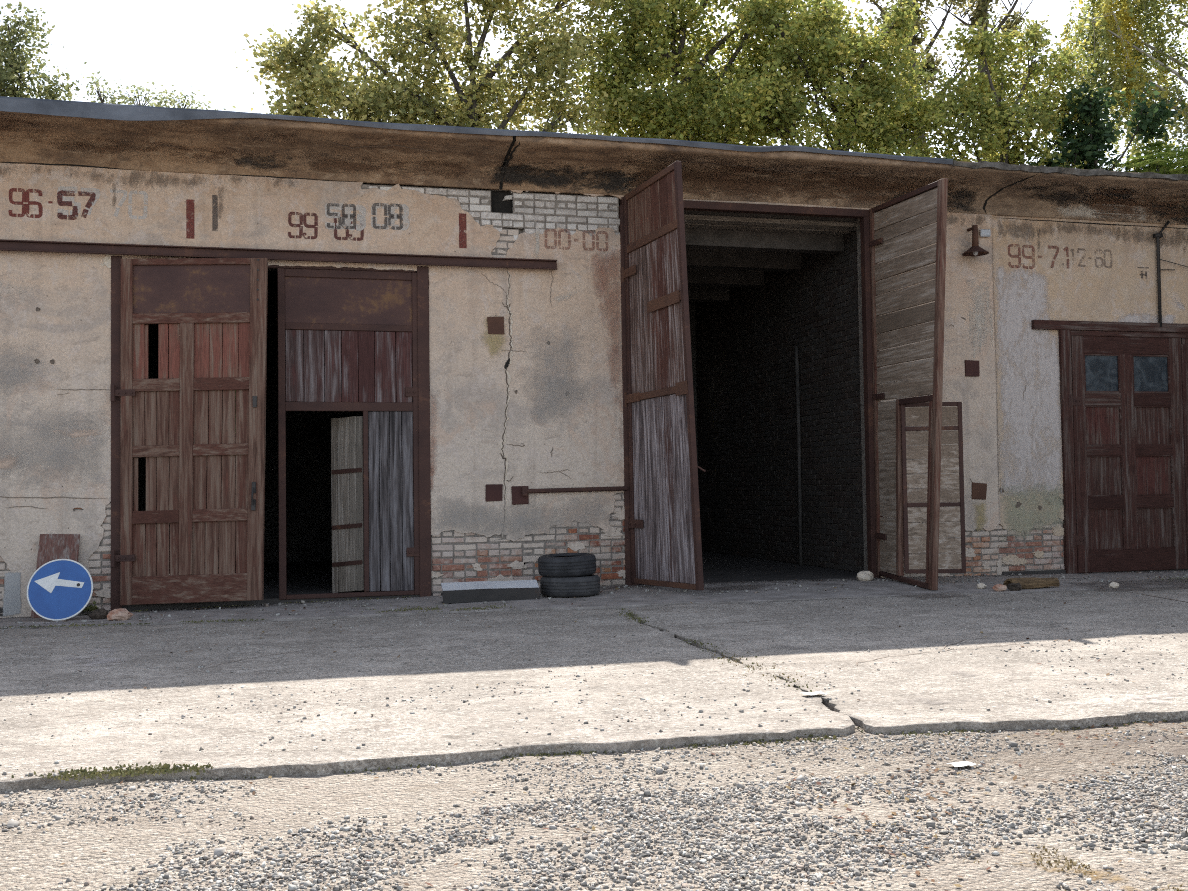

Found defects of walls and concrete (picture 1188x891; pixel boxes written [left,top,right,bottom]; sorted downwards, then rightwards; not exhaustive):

flaking render [361,184,620,258]
water stain [1025,186,1188,223]
crack [482,268,571,537]
peeling [948,268,1065,576]
flaking render [431,492,625,596]